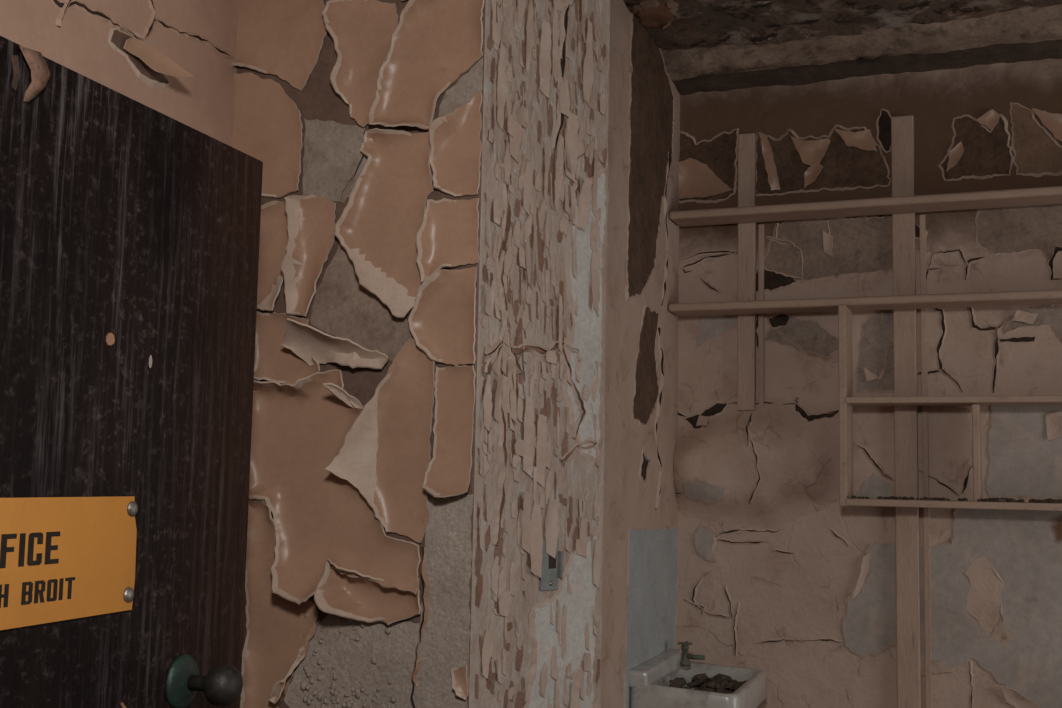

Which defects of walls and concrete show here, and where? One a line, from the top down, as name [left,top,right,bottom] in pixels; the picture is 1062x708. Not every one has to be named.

peeling [108,24,194,90]
peeling [756,109,891,196]
peeling [938,102,1062,181]
peeling [625,0,739,430]
peeling [232,0,609,708]
peeling [623,525,678,708]
crack [716,413,794,556]
crack [683,578,844,656]
crack [829,528,850,547]
peeling [840,540,896,658]
crack [854,442,973,497]
peeling [919,405,1062,708]